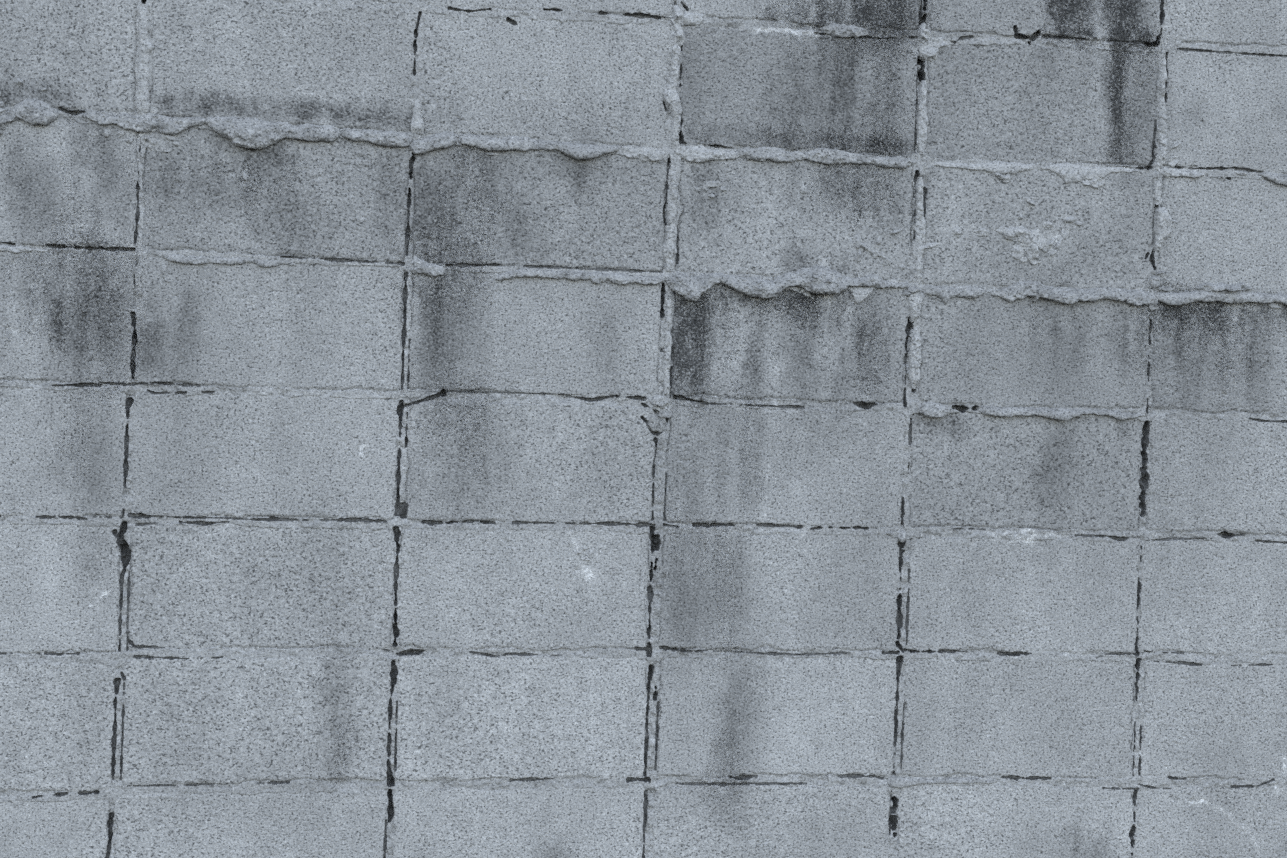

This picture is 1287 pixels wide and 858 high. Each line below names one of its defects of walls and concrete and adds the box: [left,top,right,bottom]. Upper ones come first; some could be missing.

leakage [753,0,918,38]
leakage [1048,0,1152,157]
leakage [47,262,101,353]
leakage [670,295,710,397]